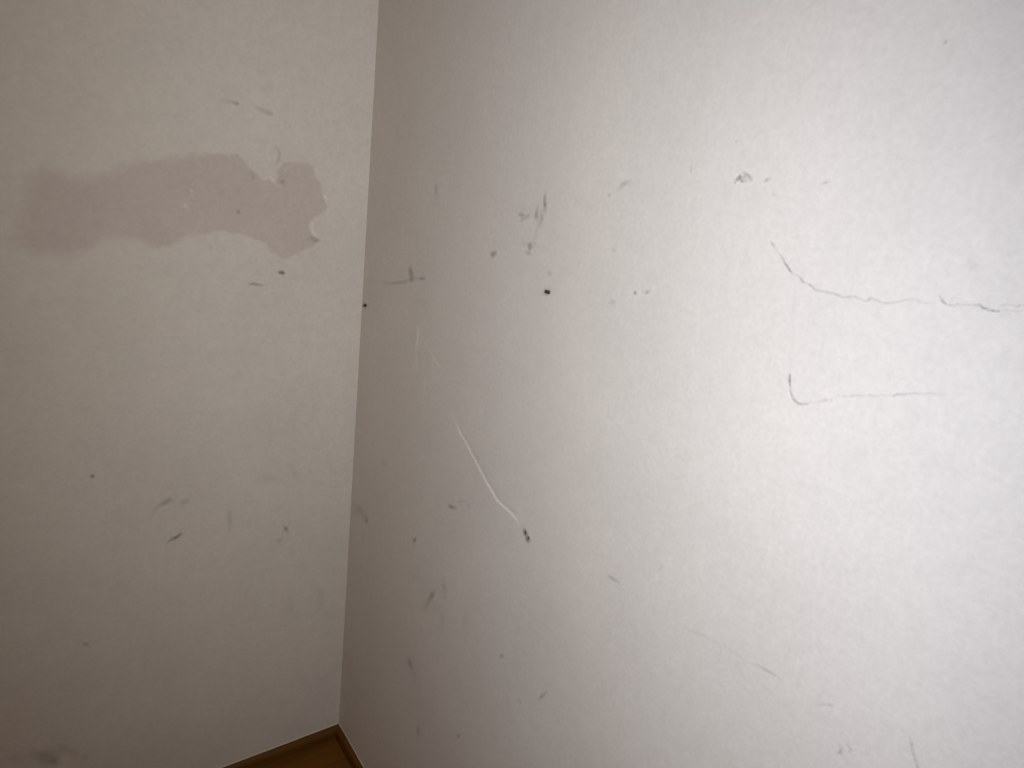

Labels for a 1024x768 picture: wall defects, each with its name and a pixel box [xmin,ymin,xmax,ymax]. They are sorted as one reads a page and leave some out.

peeling [0,149,329,265]